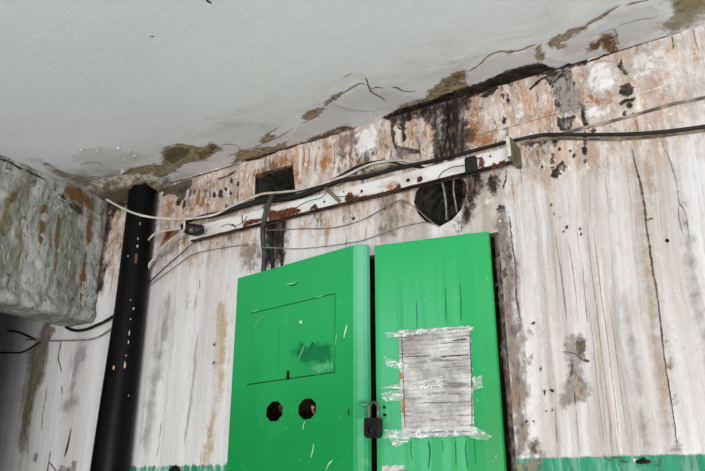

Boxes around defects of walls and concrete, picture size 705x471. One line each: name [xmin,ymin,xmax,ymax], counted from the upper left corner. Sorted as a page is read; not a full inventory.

water stain [44,163,98,185]
water stain [120,127,286,179]
peeling [391,105,435,126]
water stain [397,6,642,165]
crack [366,32,680,157]
crack [627,77,701,98]
corrosion [0,192,23,275]
corrosion [39,204,47,243]
corrosion [58,186,94,301]
corrosion [230,207,301,229]
crack [631,120,681,451]
water stain [568,226,628,443]